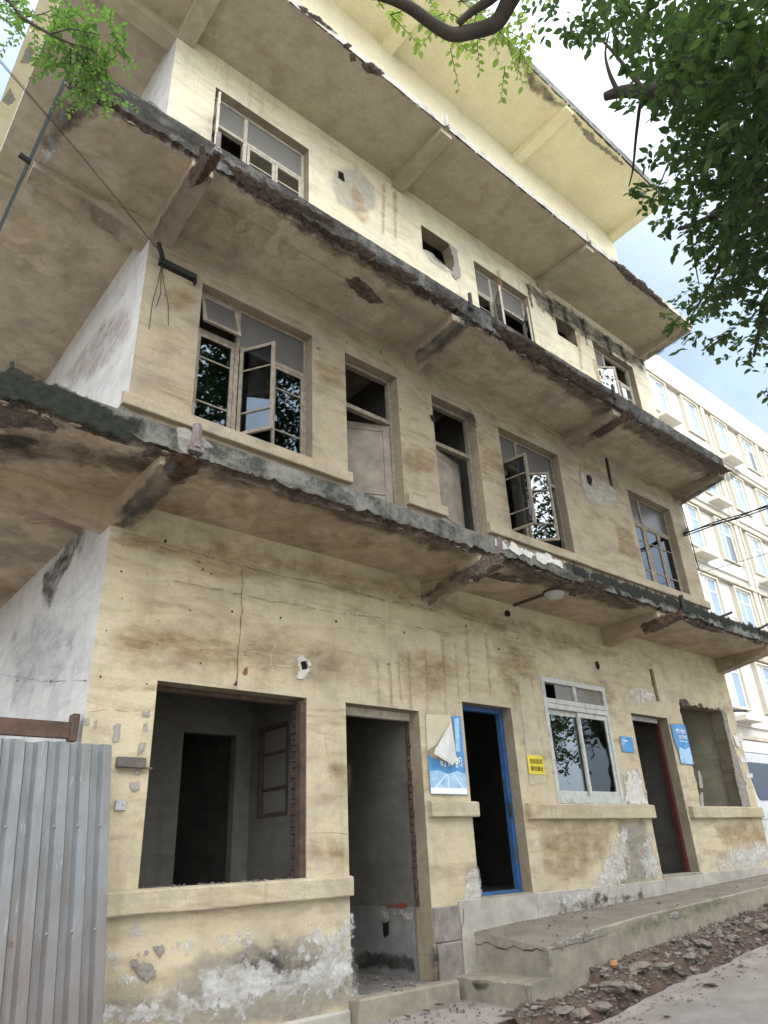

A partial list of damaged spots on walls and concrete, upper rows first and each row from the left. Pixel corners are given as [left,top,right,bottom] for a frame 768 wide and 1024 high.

water stain [527,73,557,104]
spalling [64,78,733,474]
water stain [527,285,685,371]
water stain [68,448,176,526]
spalling [0,396,768,646]
water stain [42,533,81,602]
crack [128,533,570,684]
peeling [621,767,648,805]
flaking render [463,870,481,900]
flaking render [131,945,165,983]